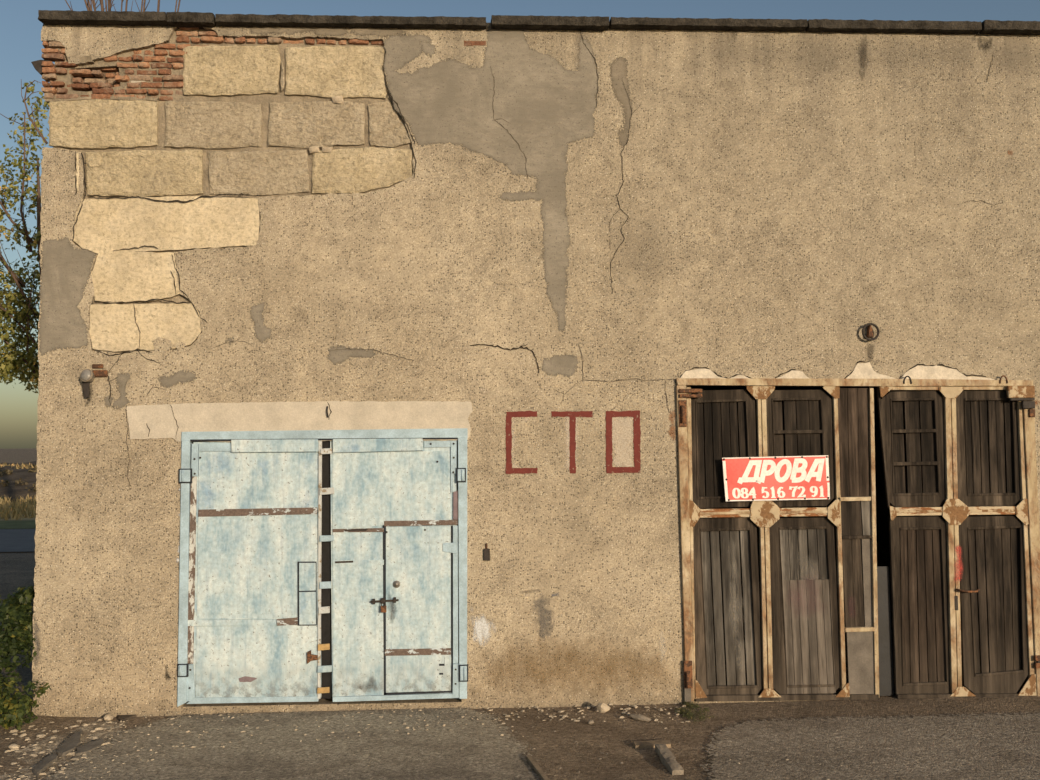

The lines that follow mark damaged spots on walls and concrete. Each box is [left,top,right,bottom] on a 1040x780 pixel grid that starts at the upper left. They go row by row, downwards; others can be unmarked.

spalling [41,27,413,354]
crack [580,31,641,293]
crack [470,344,798,411]